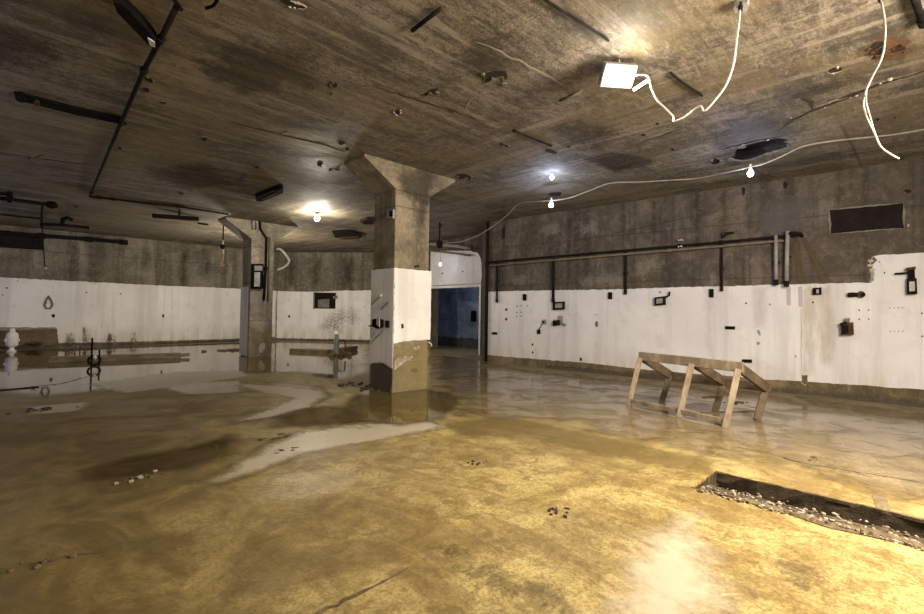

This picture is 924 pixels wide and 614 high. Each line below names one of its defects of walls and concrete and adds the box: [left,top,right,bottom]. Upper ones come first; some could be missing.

peeling [867,256,877,283]
crack [0,551,105,574]
crack [314,567,408,614]